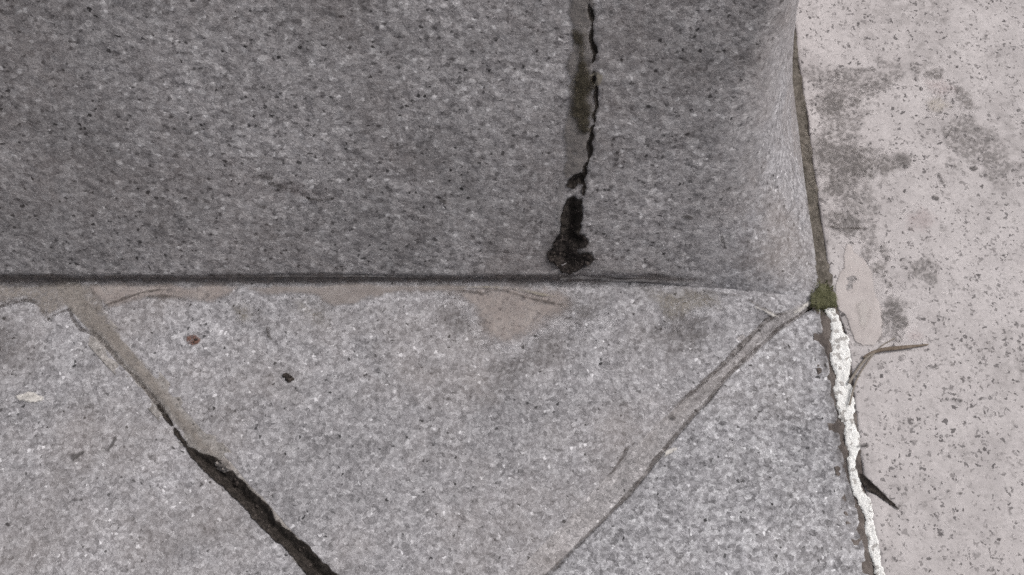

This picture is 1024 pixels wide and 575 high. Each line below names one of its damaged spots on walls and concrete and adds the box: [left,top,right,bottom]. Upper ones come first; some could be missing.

crack [547,4,599,275]
crack [0,299,338,575]
crack [859,473,899,509]